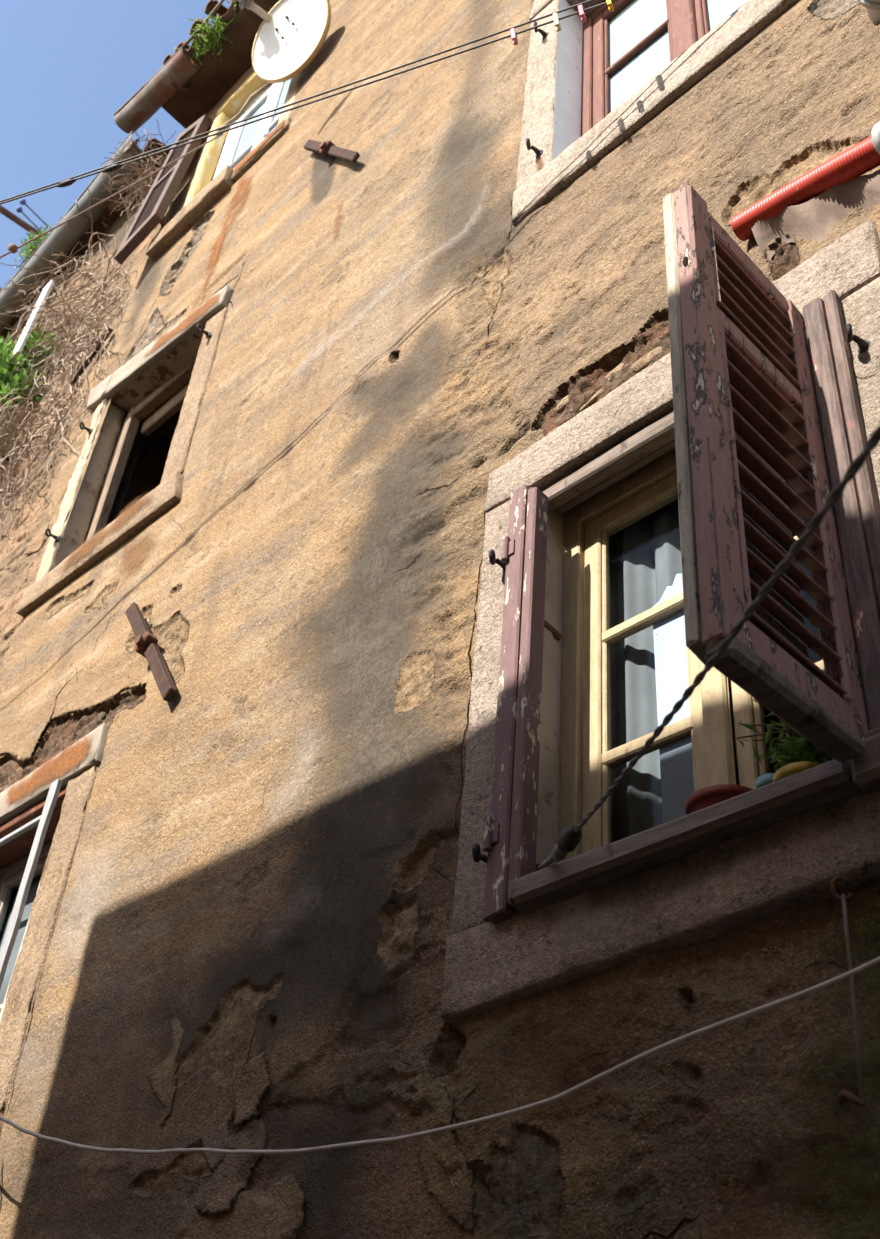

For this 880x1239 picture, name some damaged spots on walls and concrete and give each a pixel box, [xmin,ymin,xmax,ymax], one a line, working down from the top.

spalling [807,0,861,20]
spalling [764,234,800,280]
spalling [531,308,670,435]
spalling [124,632,144,658]
spalling [141,584,190,684]
flaking render [0,652,146,793]
spalling [377,828,439,971]
spalling [128,972,306,1239]
crack [453,1083,480,1134]
crack [642,1209,705,1239]